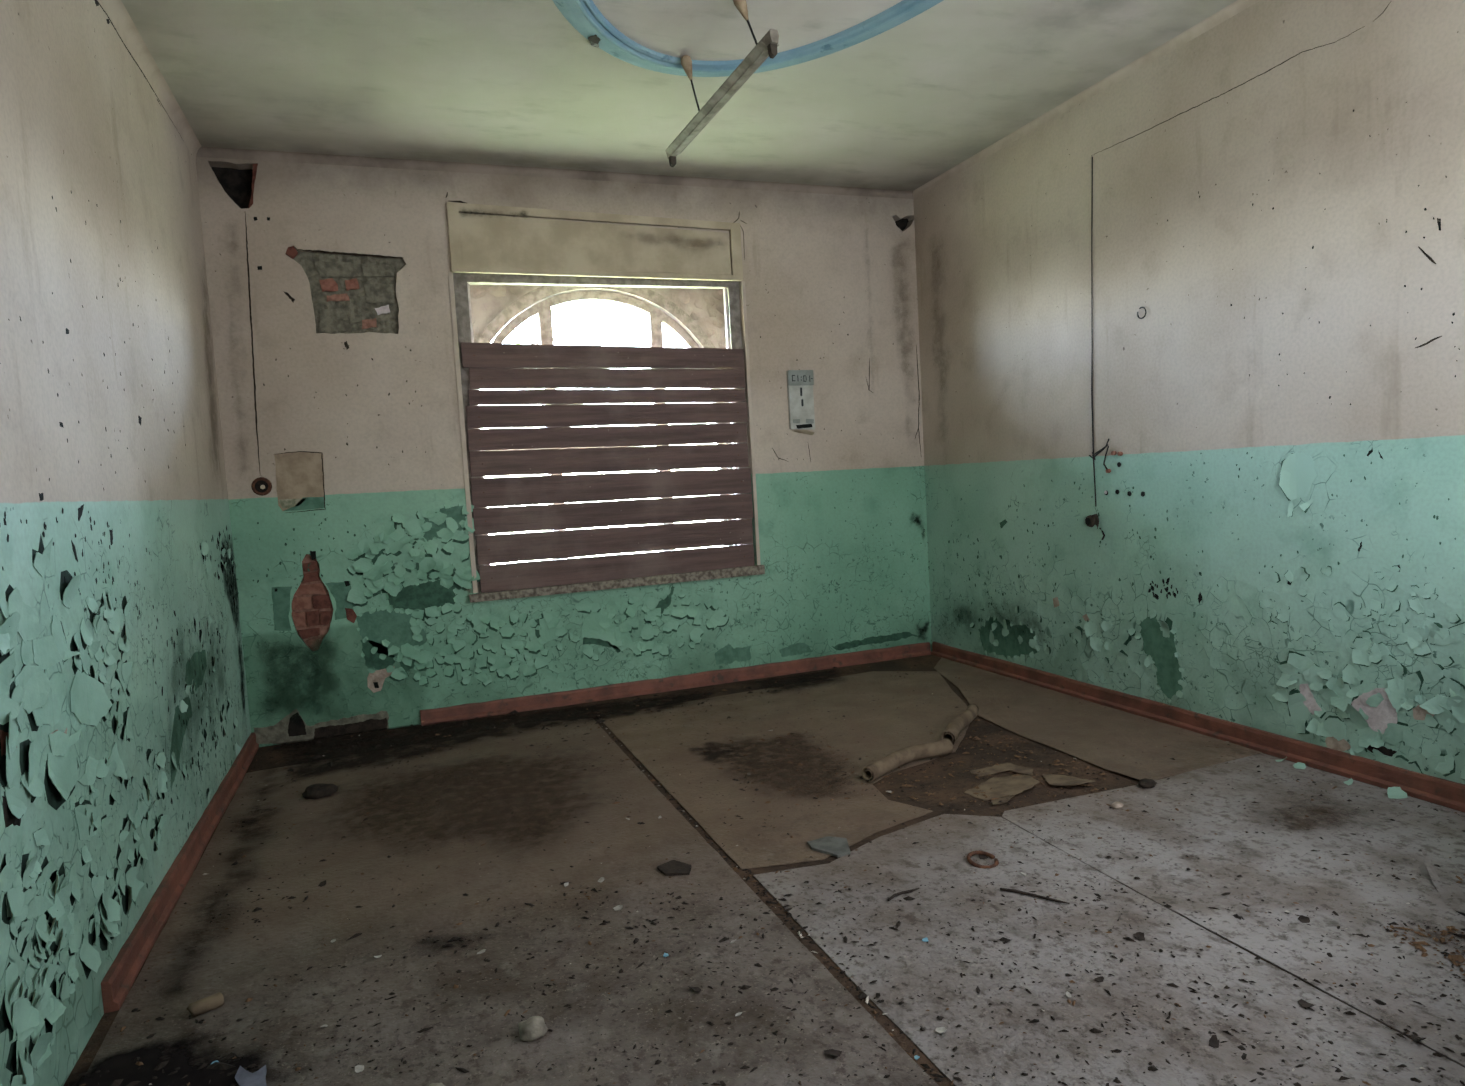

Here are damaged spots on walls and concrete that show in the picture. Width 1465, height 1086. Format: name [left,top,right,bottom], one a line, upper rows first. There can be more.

crack [1091,1,1391,156]
flaking render [283,246,406,349]
peeling [1253,453,1337,518]
peeling [832,631,918,650]
water stain [268,641,334,711]
peeling [0,503,755,1086]
water stain [694,734,845,796]
water stain [63,1035,267,1086]